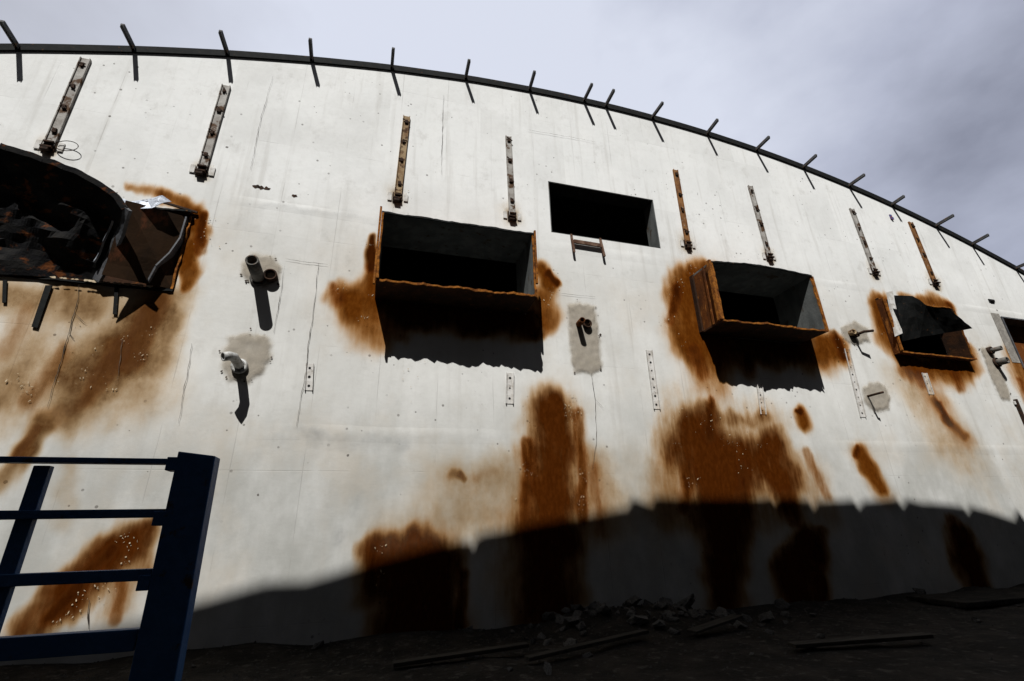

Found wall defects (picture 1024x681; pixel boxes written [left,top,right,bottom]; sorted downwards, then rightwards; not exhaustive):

corrosion [5,292,177,474]
corrosion [156,190,210,290]
corrosion [337,234,560,340]
corrosion [515,388,591,624]
corrosion [668,259,733,374]
corrosion [664,402,829,609]
corrosion [814,331,846,362]
corrosion [854,446,887,494]
corrosion [871,295,975,381]
corrosion [932,397,967,439]
corrosion [13,518,156,636]
corrosion [359,525,466,635]